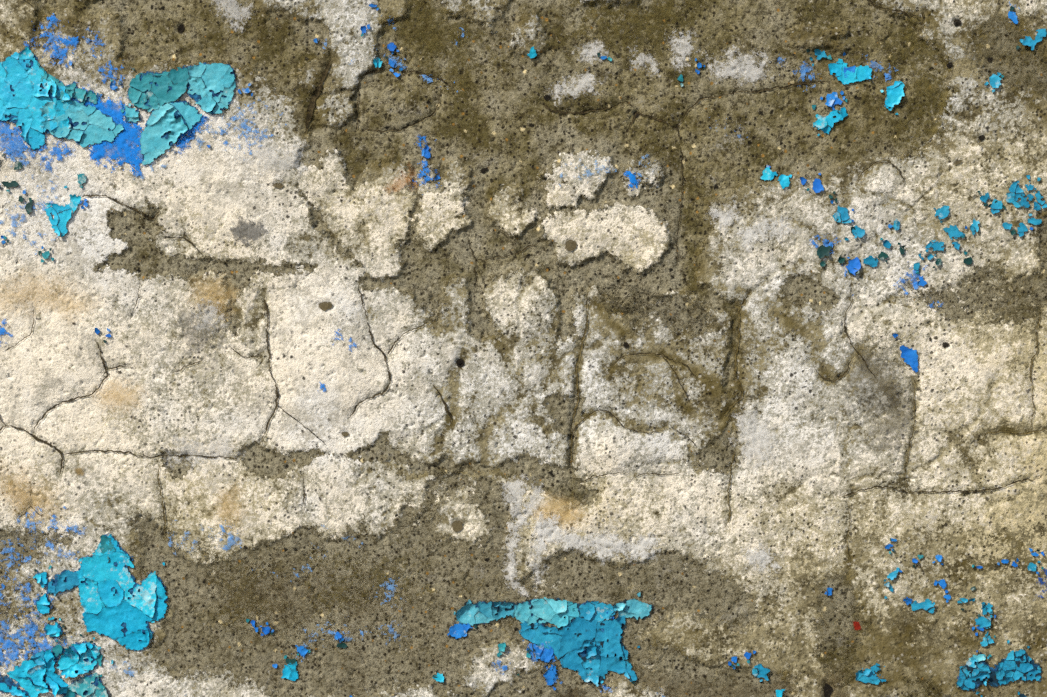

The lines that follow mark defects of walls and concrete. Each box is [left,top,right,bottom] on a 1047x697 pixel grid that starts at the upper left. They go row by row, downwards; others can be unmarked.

damp [551,42,607,101]
damp [708,45,769,85]
damp [230,216,267,245]
spalling [0,0,1047,481]
crack [0,340,238,537]
crack [232,296,326,445]
crack [349,285,432,418]
spalling [0,375,797,697]
damp [502,477,661,596]
spalling [809,555,1042,697]
crack [840,380,1039,567]
peeling [997,548,1047,598]